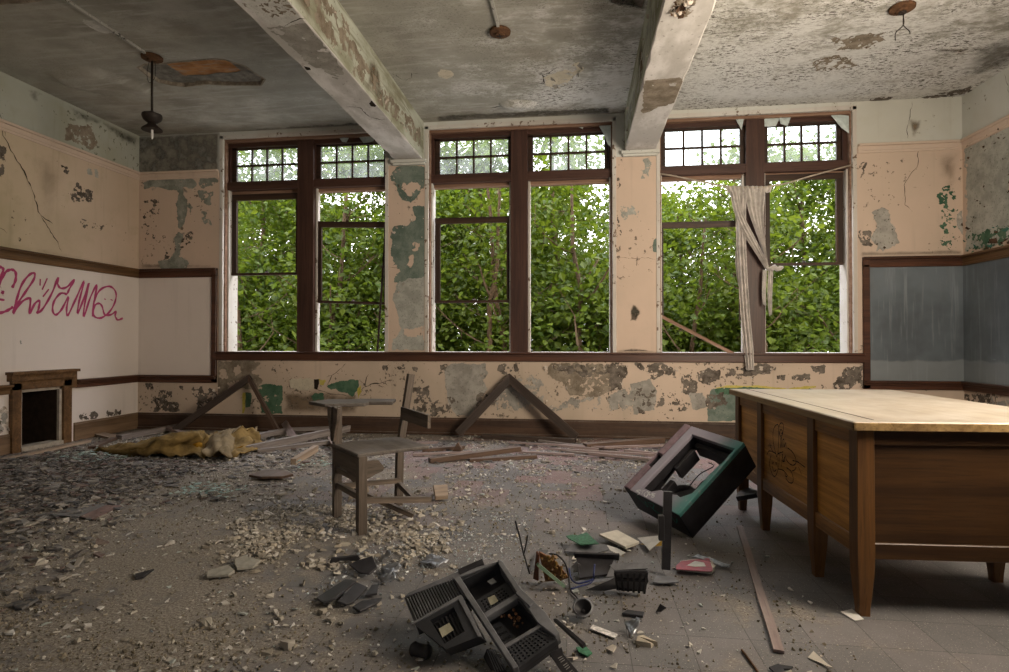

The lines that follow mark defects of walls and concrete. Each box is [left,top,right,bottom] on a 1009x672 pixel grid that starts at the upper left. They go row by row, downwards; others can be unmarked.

spalling [137,58,266,87]
peeling [242,0,424,149]
flaking render [624,0,683,146]
peeling [812,32,886,72]
peeling [65,123,98,150]
crack [0,116,61,250]
peeling [68,182,93,202]
peeling [140,178,218,269]
peeling [389,166,425,351]
peeling [937,127,1009,252]
peeling [145,360,263,412]
peeling [382,362,716,417]